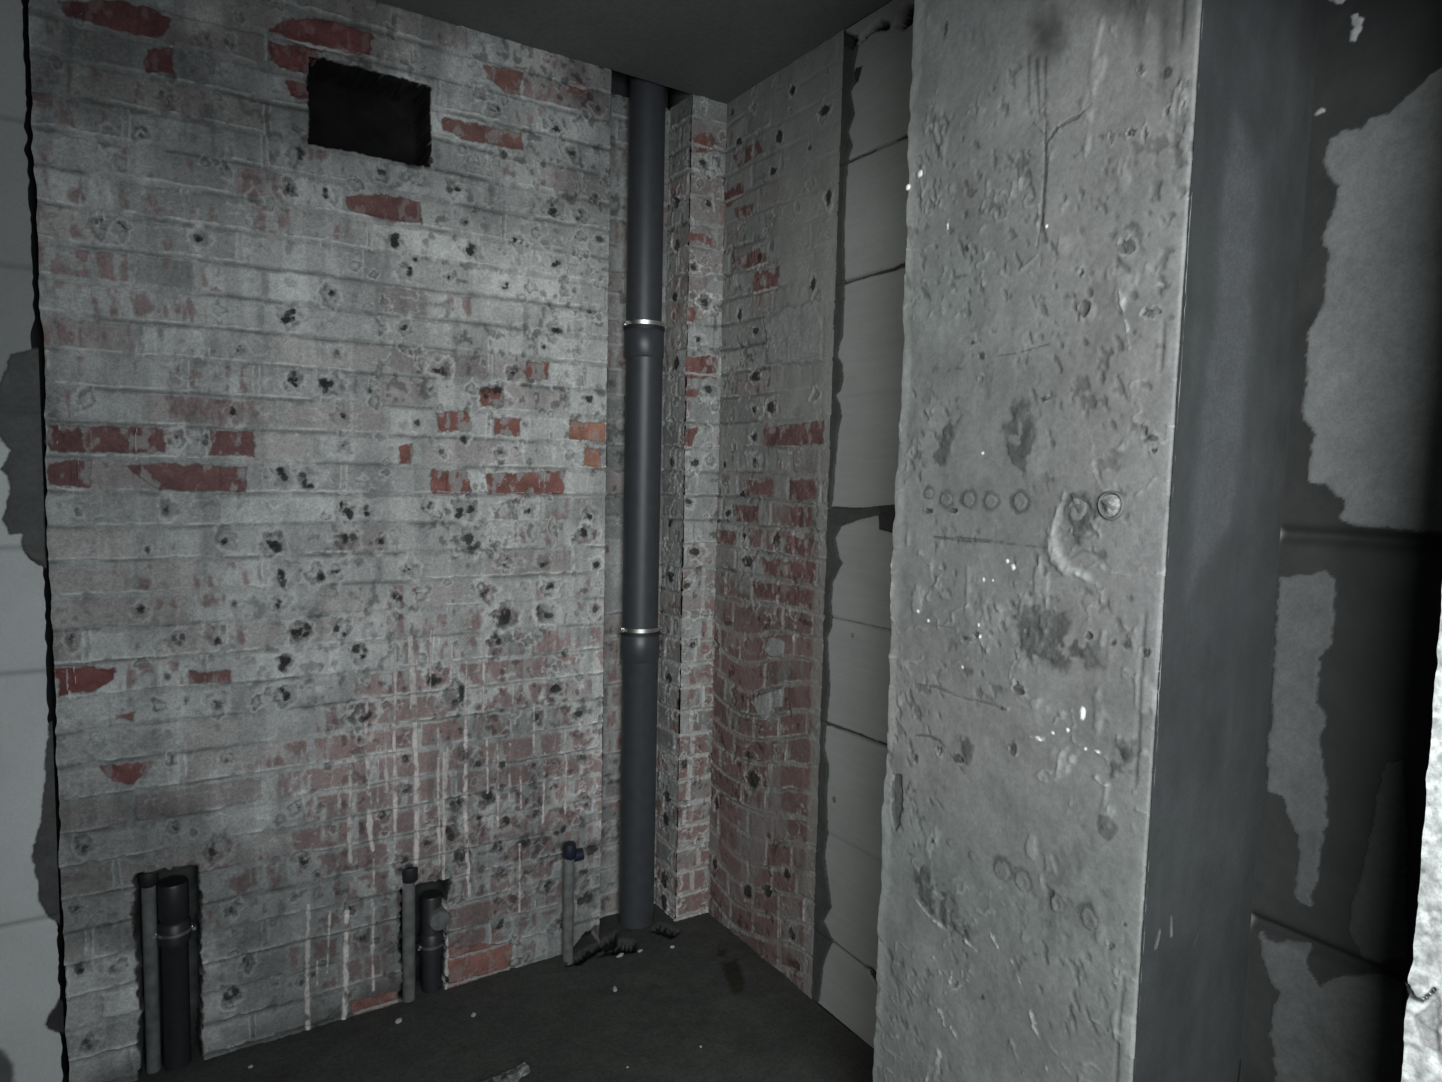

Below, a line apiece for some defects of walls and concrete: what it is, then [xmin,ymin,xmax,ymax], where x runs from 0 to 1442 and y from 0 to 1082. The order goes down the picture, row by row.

peeling [1330,0,1364,41]
crack [1033,111,1084,241]
peeling [1301,67,1442,534]
damp [304,903,350,1030]
damp [337,630,432,991]
damp [436,644,486,897]
damp [486,739,522,827]
damp [533,704,546,824]
peeling [1266,570,1337,907]
peeling [1258,759,1410,1082]